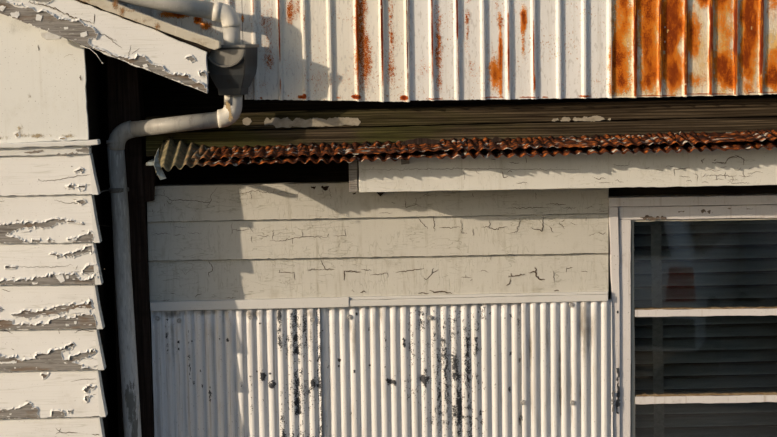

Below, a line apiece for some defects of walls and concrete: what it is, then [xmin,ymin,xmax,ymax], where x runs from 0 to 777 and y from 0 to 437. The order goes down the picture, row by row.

peeling [0,0,209,92]
corrosion [298,0,397,99]
corrosion [420,0,443,100]
corrosion [485,1,548,98]
corrosion [608,0,777,96]
crack [363,159,628,235]
crack [648,155,757,184]
peeling [0,298,97,330]
peeling [0,217,100,285]
crack [279,261,452,295]
crack [506,267,587,291]
peeling [0,342,100,380]